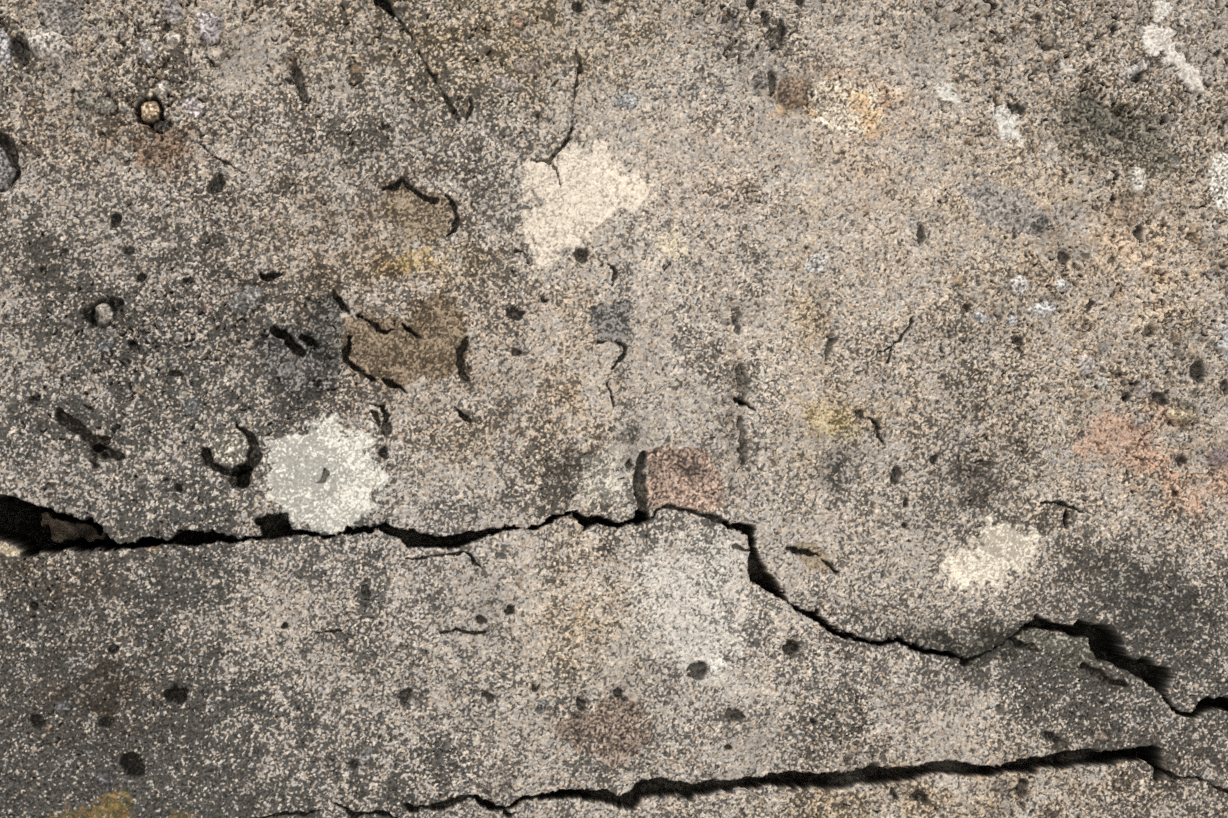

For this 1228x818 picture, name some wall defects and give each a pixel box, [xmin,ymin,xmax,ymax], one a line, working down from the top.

crack [202,419,262,488]
crack [868,417,885,445]
crack [1040,501,1082,521]
crack [0,451,960,659]
crack [990,615,1228,716]
crack [268,746,1228,818]